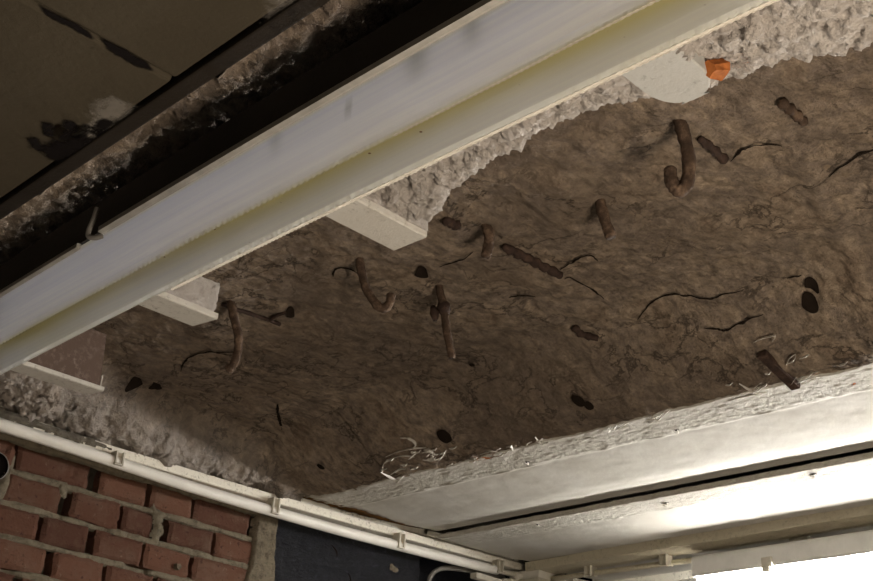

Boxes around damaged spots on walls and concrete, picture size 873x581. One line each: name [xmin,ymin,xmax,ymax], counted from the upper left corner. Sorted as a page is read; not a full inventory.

corrosion [705,58,730,81]
spalling [777,97,808,126]
spalling [664,119,729,198]
crack [730,144,781,162]
crack [829,150,873,177]
spalling [481,224,563,279]
crack [637,290,743,320]
spalling [430,284,456,359]
spalling [571,325,599,342]
crack [704,314,763,332]
peeling [725,372,771,401]
peeling [380,437,457,483]